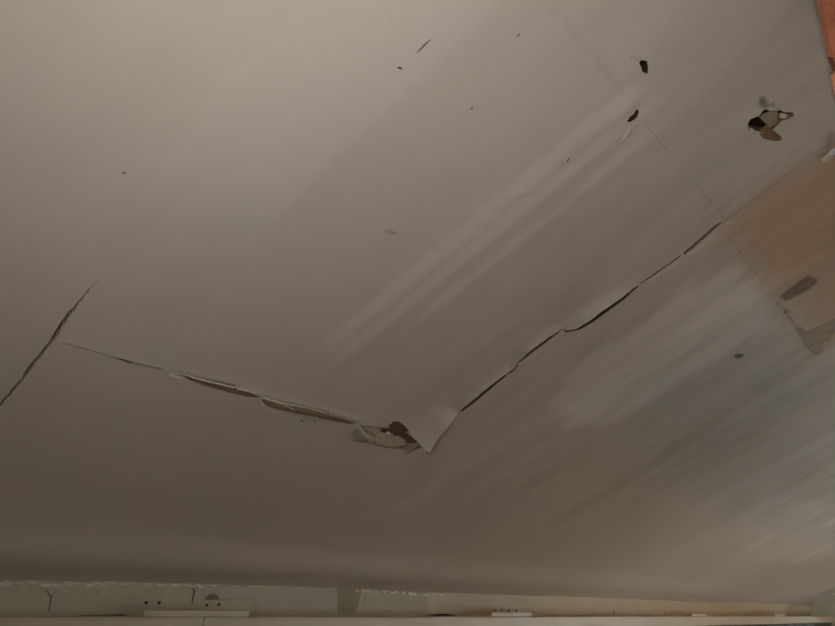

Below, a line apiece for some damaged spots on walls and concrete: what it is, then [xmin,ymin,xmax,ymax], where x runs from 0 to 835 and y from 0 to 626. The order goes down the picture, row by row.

crack [0,279,100,406]
leakage [782,277,816,300]